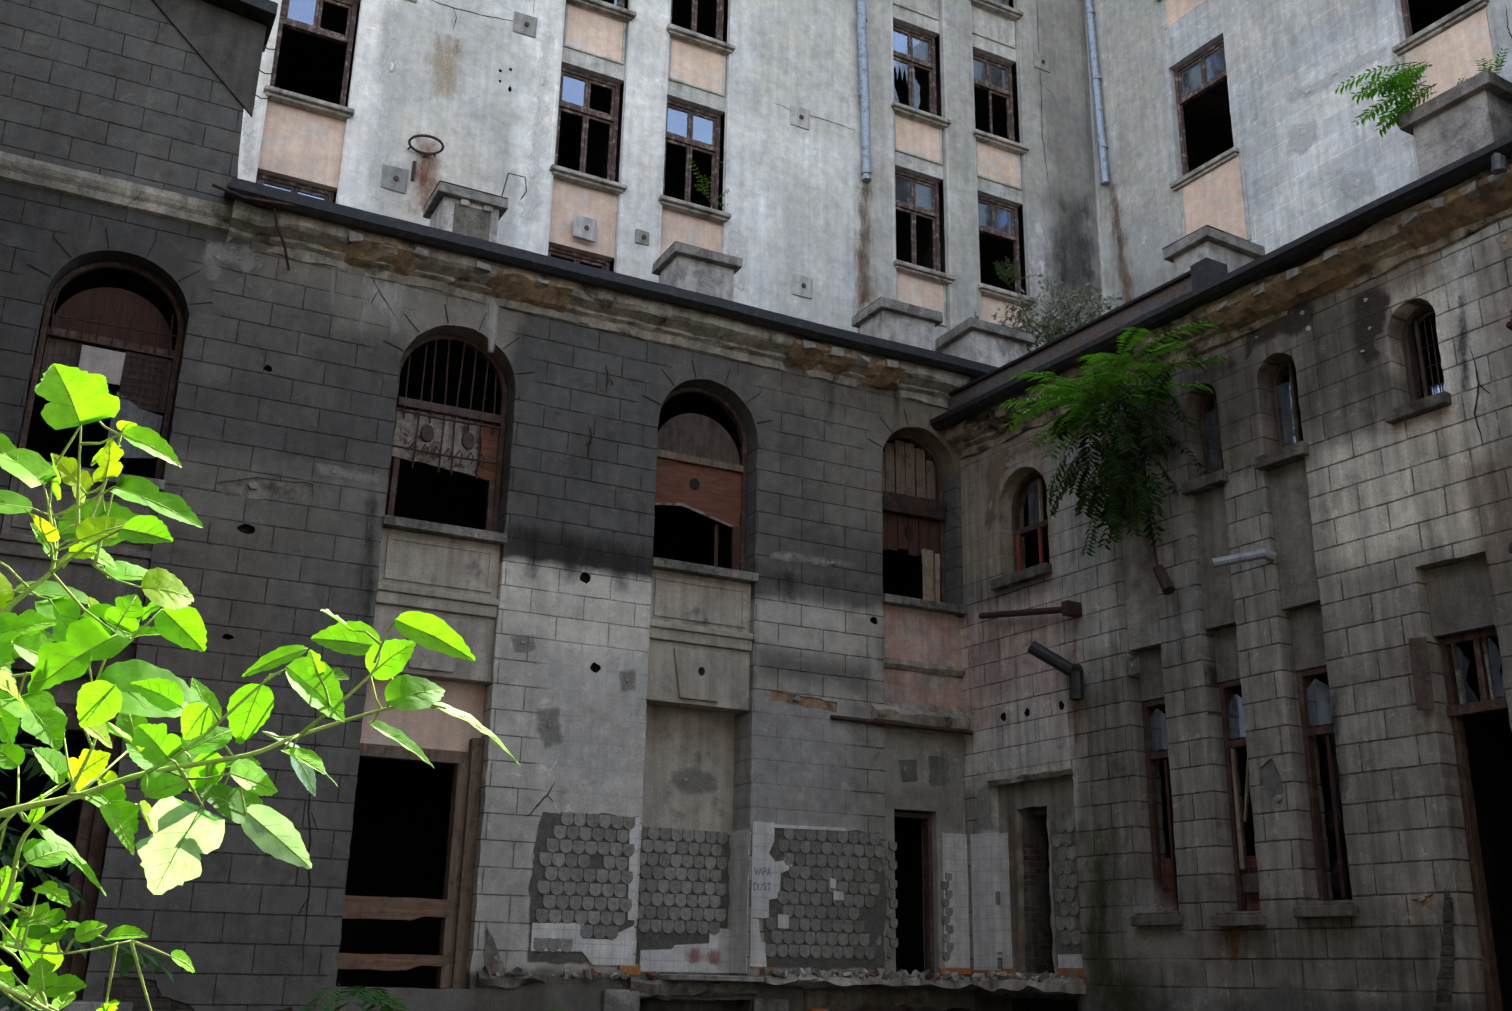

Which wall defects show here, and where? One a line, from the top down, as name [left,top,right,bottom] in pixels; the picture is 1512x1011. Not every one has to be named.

peeling [203,242,261,280]
spalling [321,230,429,276]
spalling [474,261,573,313]
spalling [771,690,837,713]